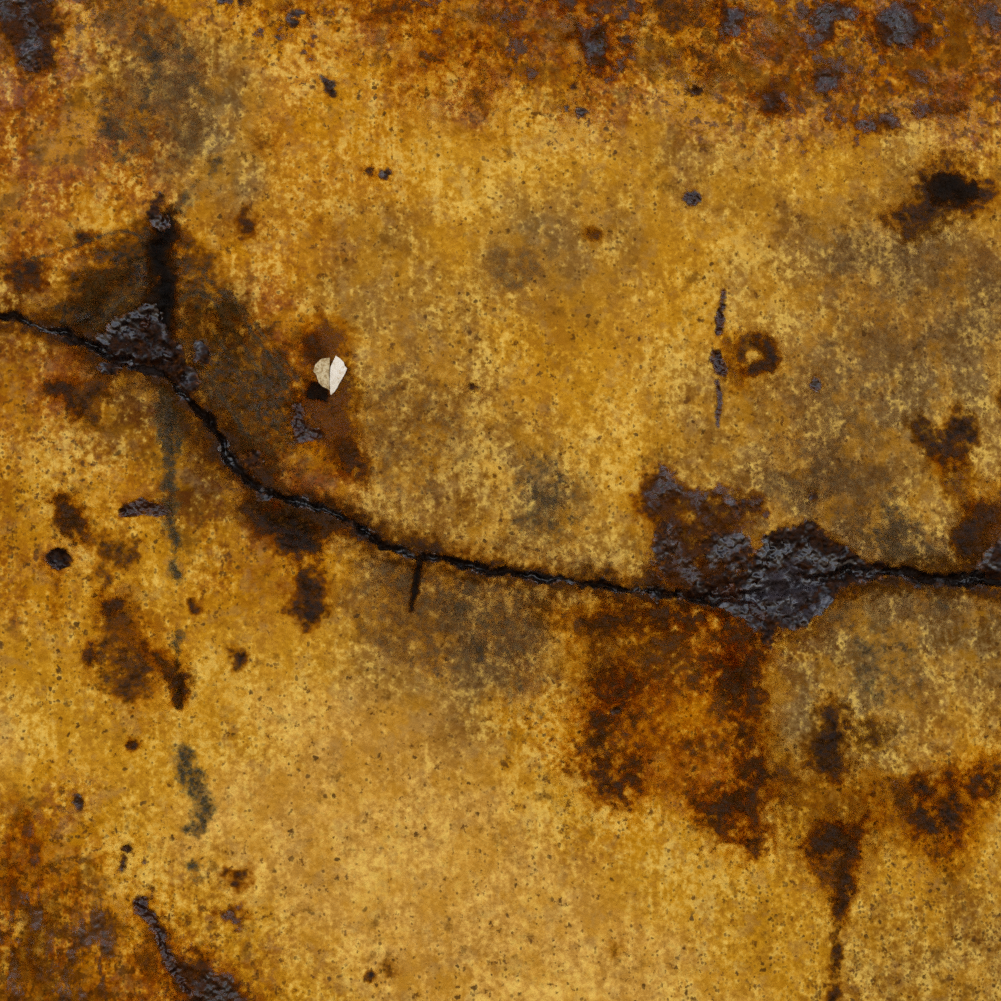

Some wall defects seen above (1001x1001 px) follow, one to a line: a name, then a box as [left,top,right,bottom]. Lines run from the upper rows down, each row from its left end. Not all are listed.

corrosion [0,0,69,75]
corrosion [714,0,966,146]
corrosion [880,150,999,239]
crack [0,156,718,613]
crack [709,289,728,428]
water stain [155,381,187,579]
corrosion [634,465,770,587]
crack [827,544,1001,609]
corrosion [911,405,979,492]
corrosion [82,597,190,706]
water stain [174,744,216,836]
corrosion [565,608,796,858]